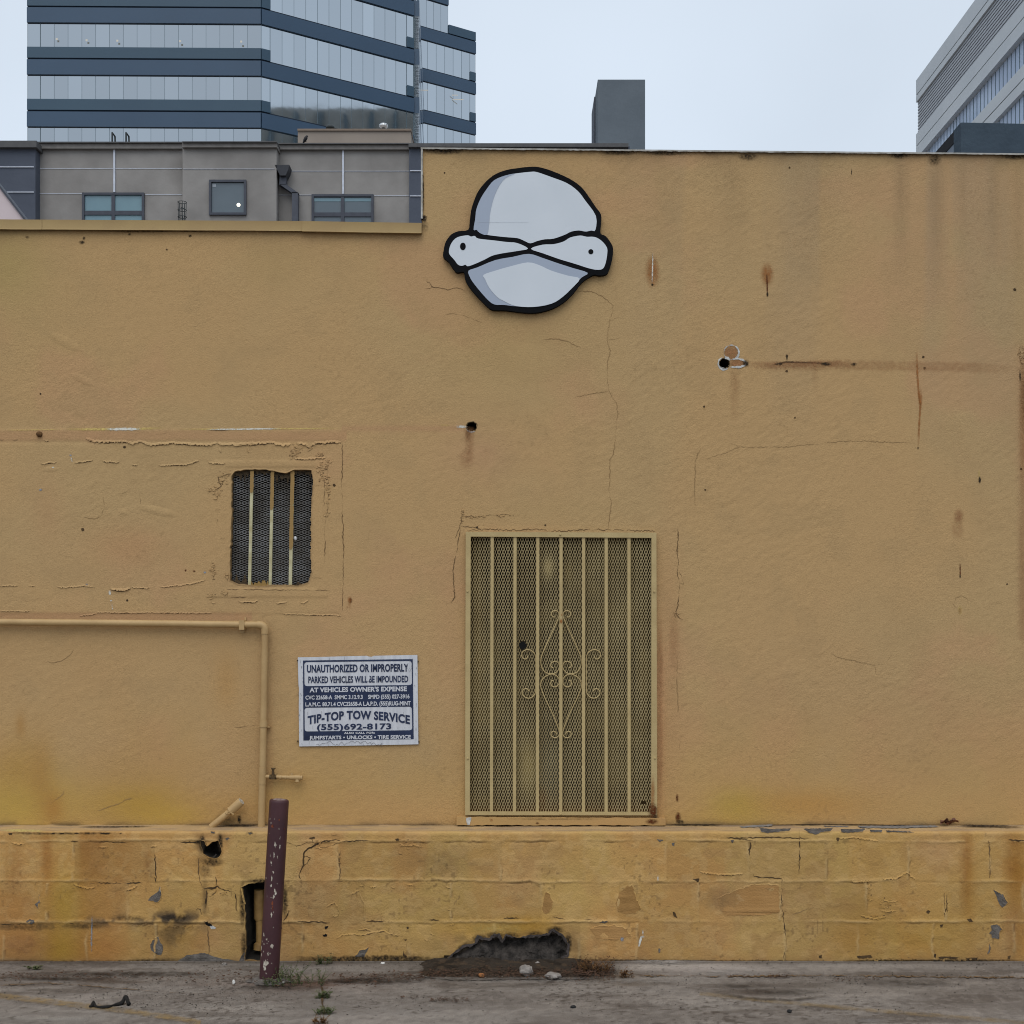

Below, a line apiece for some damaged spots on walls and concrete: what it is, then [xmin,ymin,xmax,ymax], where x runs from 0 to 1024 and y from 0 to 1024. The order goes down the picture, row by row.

peeling [86,437,341,517]
crack [452,291,684,620]
spalling [200,830,230,860]
crack [289,839,368,882]
peeling [740,824,791,833]
peeling [804,825,938,841]
spalling [178,843,285,974]
peeling [590,884,641,941]
peeling [993,889,1009,908]
spalling [445,929,570,961]